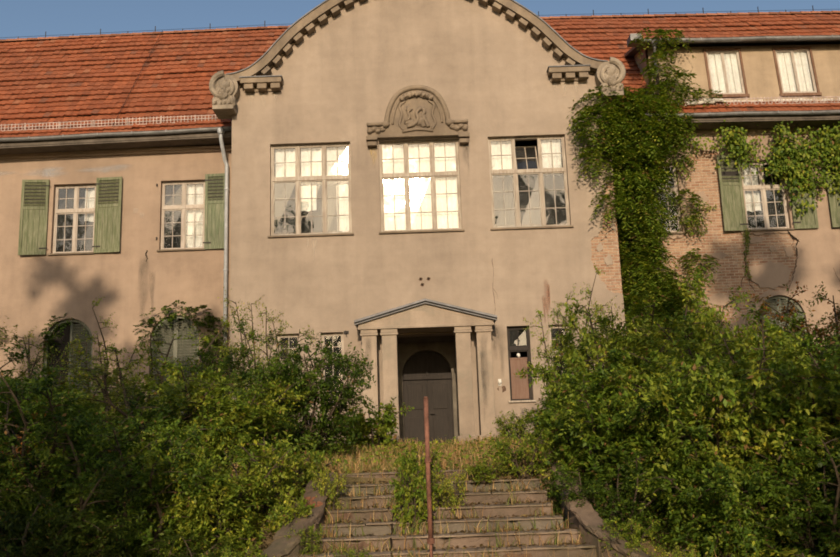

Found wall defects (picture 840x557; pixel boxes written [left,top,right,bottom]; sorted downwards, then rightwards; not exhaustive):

flaking render [591,180,622,294]
flaking render [636,149,799,326]
crack [787,230,799,295]